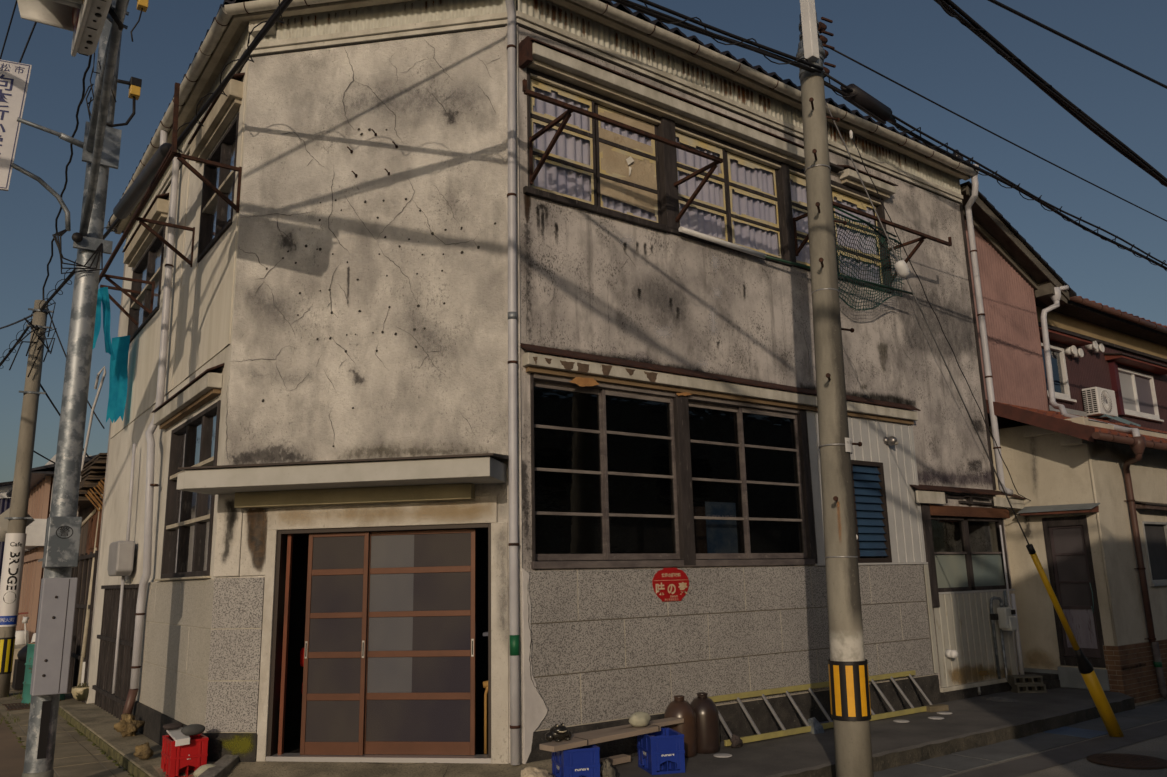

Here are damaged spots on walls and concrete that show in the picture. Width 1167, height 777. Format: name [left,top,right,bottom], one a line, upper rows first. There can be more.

rust [534,0,590,36]
crack [342,45,450,136]
rust [616,33,770,112]
crack [226,127,480,464]
damp [524,204,558,345]
peeling [533,357,658,387]
damp [846,385,916,406]
damp [918,460,993,484]